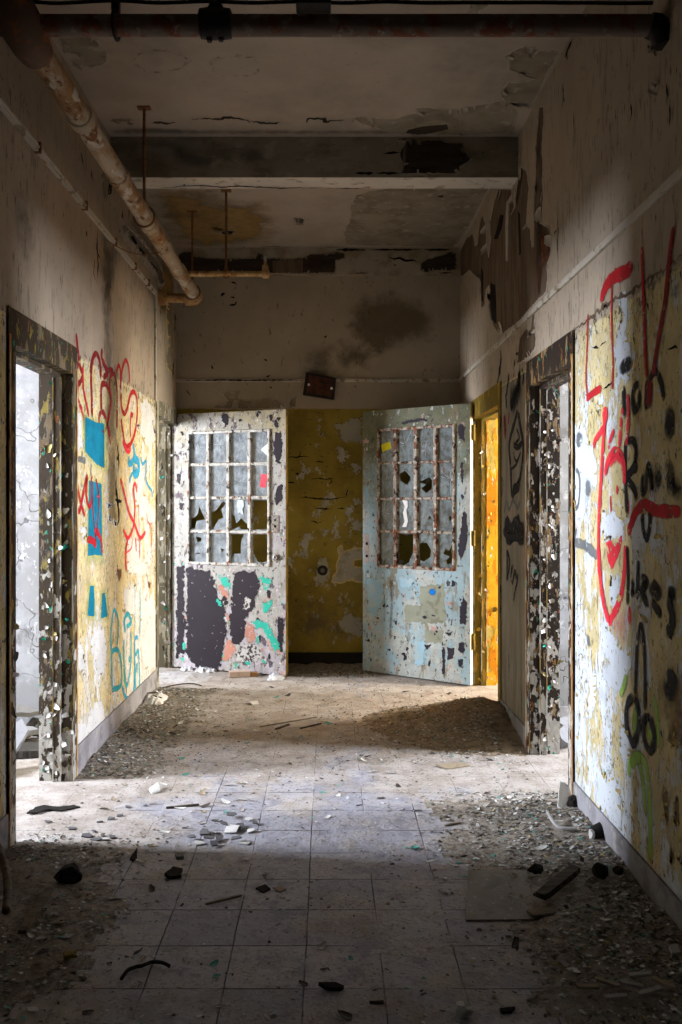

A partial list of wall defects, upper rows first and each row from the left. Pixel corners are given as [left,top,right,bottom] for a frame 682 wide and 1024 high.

leakage [158,192,267,246]
peeling [178,45,559,365]
leakage [345,300,426,365]
peeling [613,290,635,388]
peeling [137,397,169,449]
peeling [135,454,173,525]
peeling [573,421,598,523]
peeling [600,508,668,560]
peeling [123,535,170,673]
peeling [608,572,622,609]
peeling [66,623,107,677]
peeling [574,626,632,763]